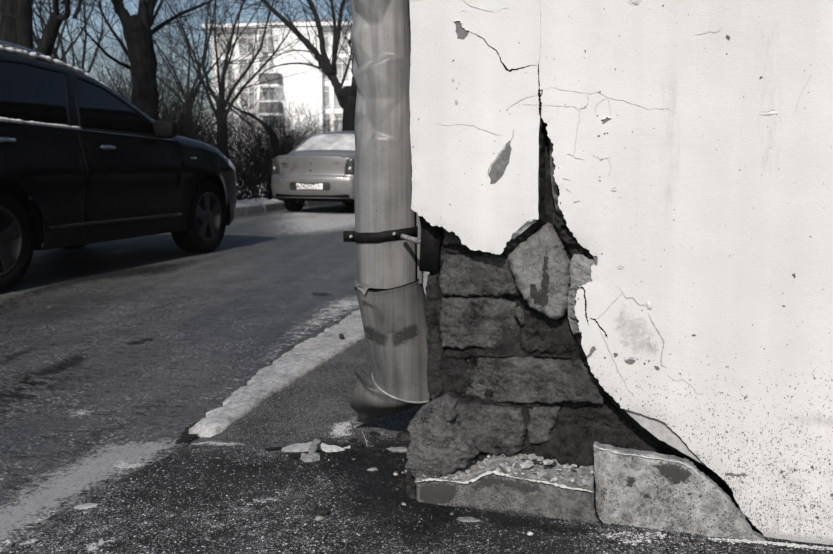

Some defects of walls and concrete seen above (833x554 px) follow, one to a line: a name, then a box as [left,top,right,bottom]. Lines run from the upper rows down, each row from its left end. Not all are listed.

peeling [454,19,469,39]
crack [471,11,669,173]
spalling [405,121,751,522]
crack [577,287,633,395]